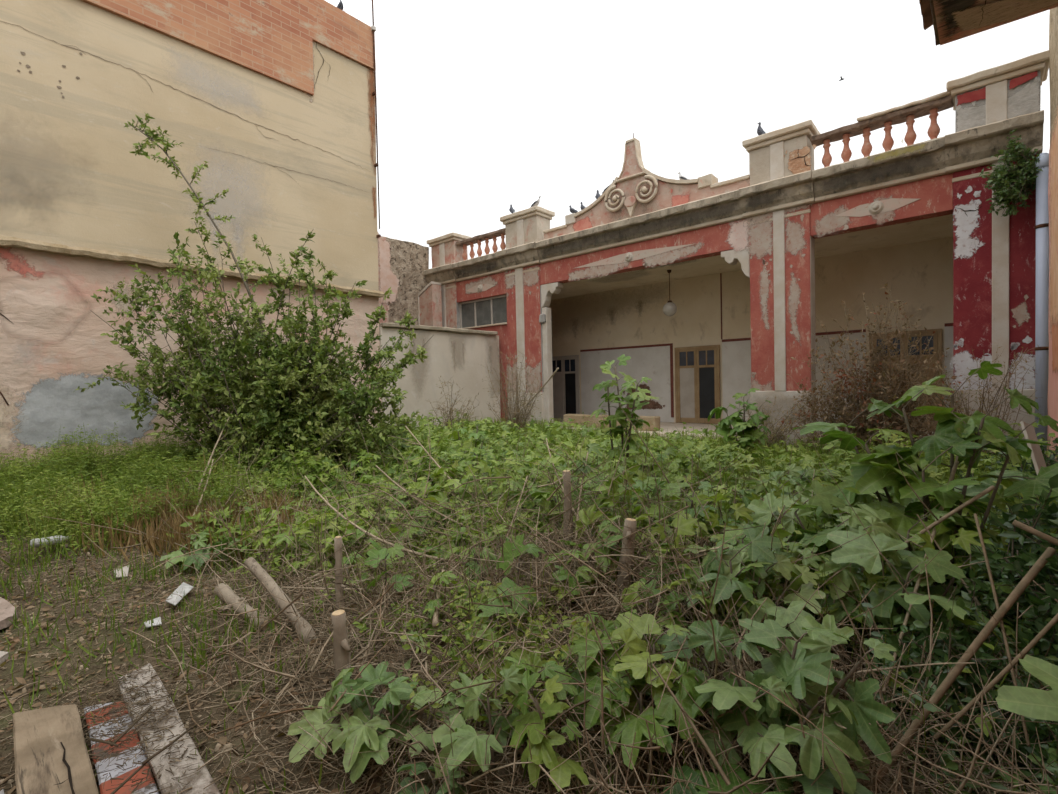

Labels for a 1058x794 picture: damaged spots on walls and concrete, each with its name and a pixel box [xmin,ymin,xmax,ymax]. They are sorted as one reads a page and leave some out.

water stain [932,0,978,42]
spalling [952,0,1058,32]
crack [1,21,369,192]
peeling [957,87,986,106]
peeling [569,262,628,281]
peeling [641,243,704,270]
peeling [727,204,850,345]
peeling [953,186,984,259]
peeling [1049,109,1058,373]
peeling [949,338,992,390]
peeling [1009,294,1035,390]
crack [55,742,75,794]